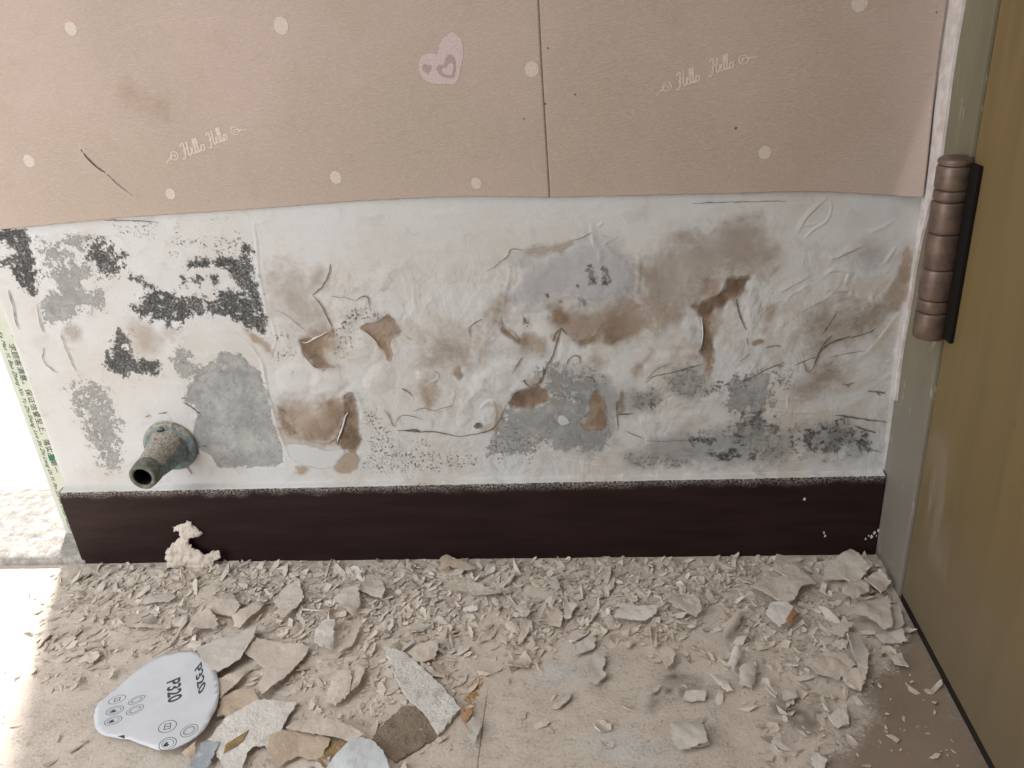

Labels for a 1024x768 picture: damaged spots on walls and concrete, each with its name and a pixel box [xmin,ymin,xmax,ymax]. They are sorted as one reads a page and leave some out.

damp [530,243,674,342]
spalling [0,222,615,473]
damp [280,402,347,440]
damp [336,451,358,473]